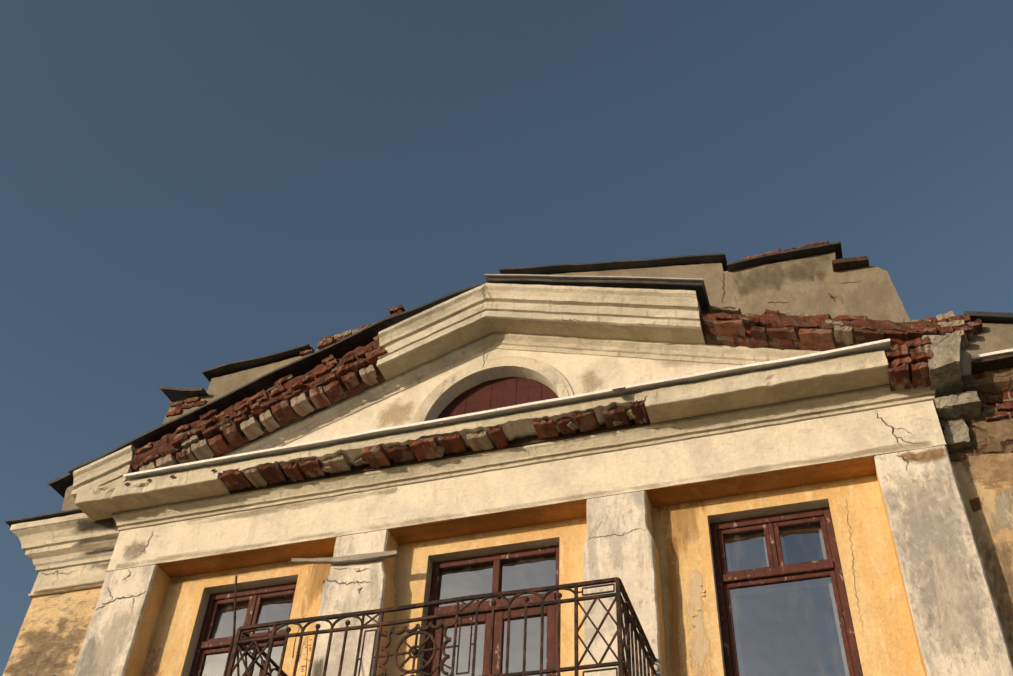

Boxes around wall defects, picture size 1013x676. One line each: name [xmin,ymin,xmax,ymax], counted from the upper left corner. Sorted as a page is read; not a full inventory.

crack [876,413,927,469]
flaking render [960,396,1013,494]
spalling [970,498,982,511]
leakage [34,580,105,593]
leakage [75,518,118,567]
crack [95,532,153,611]
leakage [126,544,145,558]